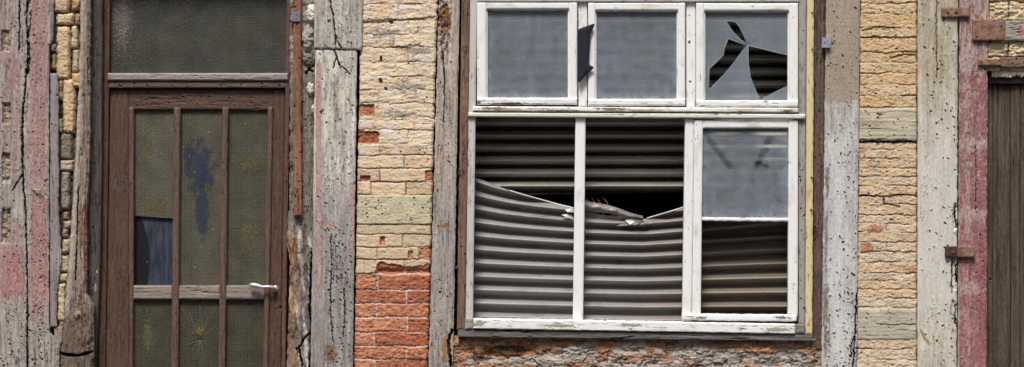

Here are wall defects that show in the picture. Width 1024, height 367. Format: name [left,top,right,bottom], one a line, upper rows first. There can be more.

crack [305,0,350,75]
crack [12,0,32,367]
peeling [959,1,988,367]
spalling [471,346,530,361]
spalling [562,341,595,360]
spalling [666,346,716,362]
spalling [735,353,777,366]